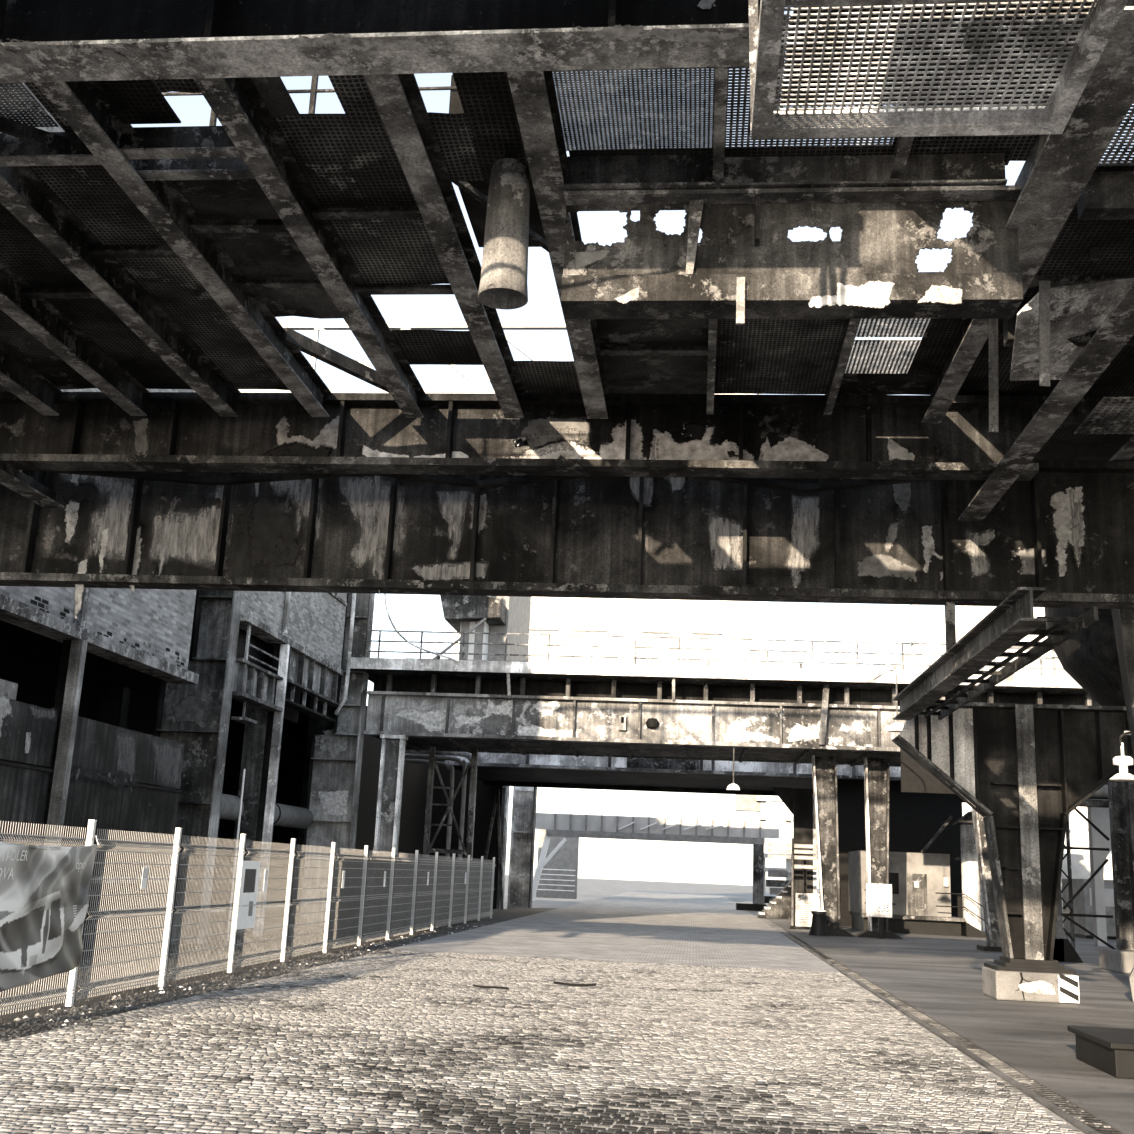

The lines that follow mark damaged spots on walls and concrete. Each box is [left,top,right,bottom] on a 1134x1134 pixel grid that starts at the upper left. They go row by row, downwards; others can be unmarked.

peeling [275,416,347,449]
peeling [511,416,591,453]
peeling [470,493,487,534]
peeling [342,475,406,594]
peeling [0,695,12,737]
peeling [391,699,578,737]